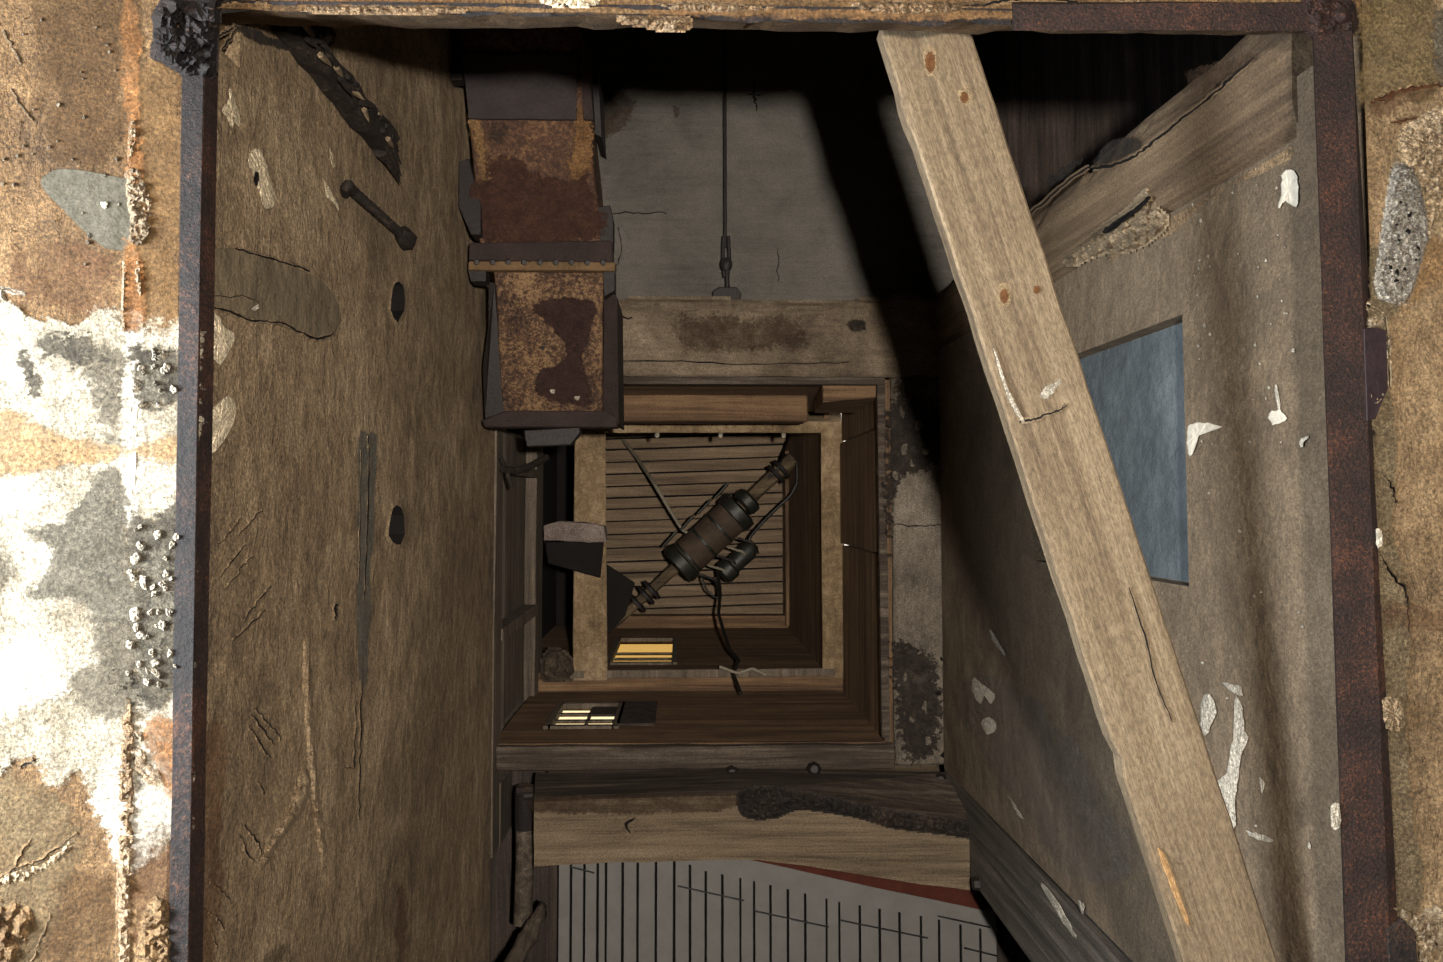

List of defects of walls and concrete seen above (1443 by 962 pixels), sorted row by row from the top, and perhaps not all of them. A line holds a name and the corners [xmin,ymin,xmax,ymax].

rust [119,7,144,183]
peeling [247,148,276,209]
peeling [323,148,339,211]
rust [469,155,608,243]
leakage [1356,0,1443,314]
rust [123,238,146,331]
rust [532,297,597,407]
leakage [0,120,179,962]
flaking render [1363,106,1443,962]
leakage [1417,906,1443,962]